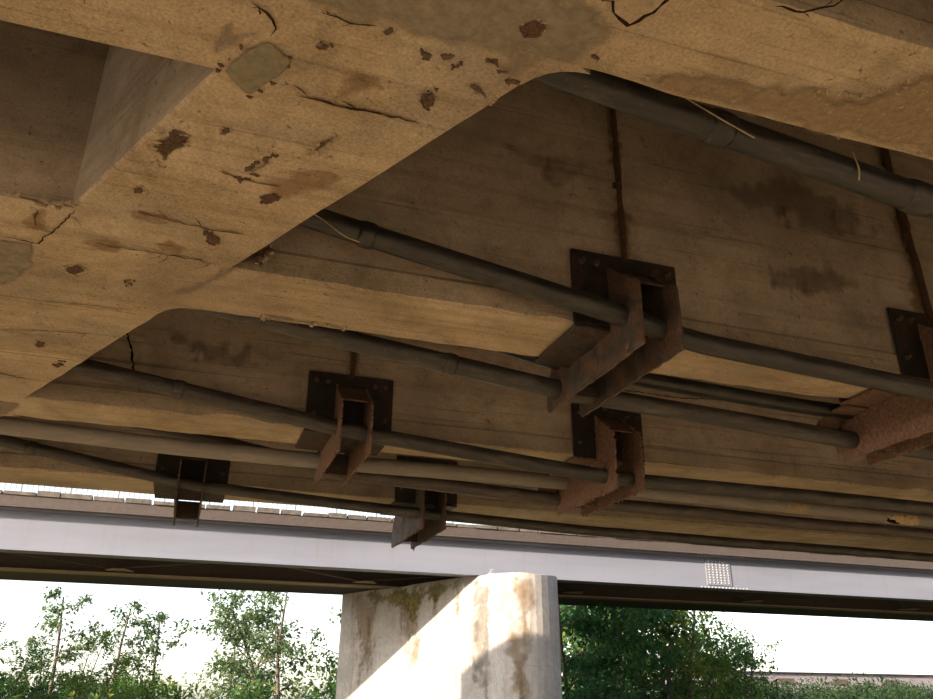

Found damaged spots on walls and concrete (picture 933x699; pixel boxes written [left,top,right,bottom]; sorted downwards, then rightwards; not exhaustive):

crack [251,1,277,35]
spalling [519,17,546,38]
crack [776,0,843,17]
spalling [419,87,439,111]
spalling [146,129,192,169]
rust [879,147,894,173]
rust [608,108,629,262]
crack [0,209,80,244]
spalling [203,230,220,246]
rust [895,208,933,321]
crack [126,333,140,392]
damp [455,576,527,699]